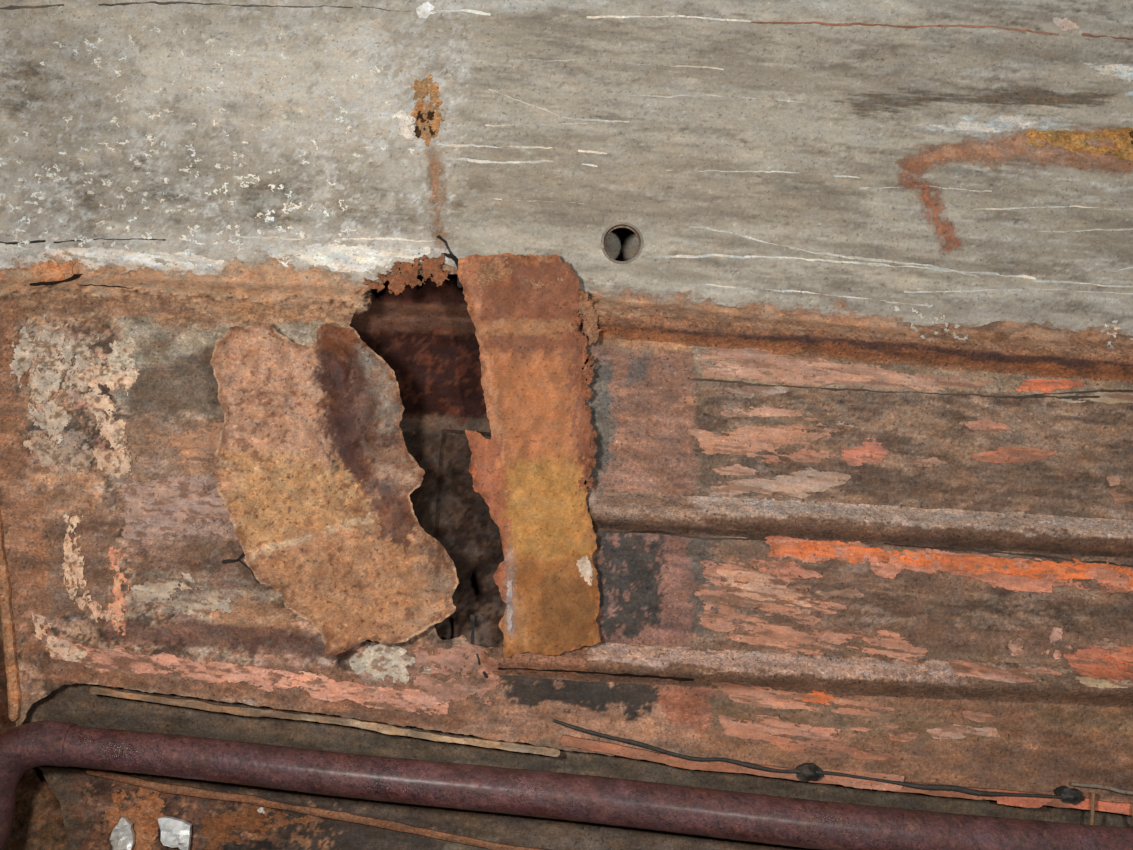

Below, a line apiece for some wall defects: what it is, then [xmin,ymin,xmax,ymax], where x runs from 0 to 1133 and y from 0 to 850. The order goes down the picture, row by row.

crack [0,3,64,11]
crack [98,1,408,12]
rust [0,74,450,314]
rust [899,127,1133,252]
peeling [263,243,431,274]
peeling [687,347,995,498]
peeling [9,326,500,715]
peeling [576,555,593,586]
peeling [693,535,1133,665]
peeling [949,627,1133,689]
rust [105,786,166,850]
rust [200,804,313,850]